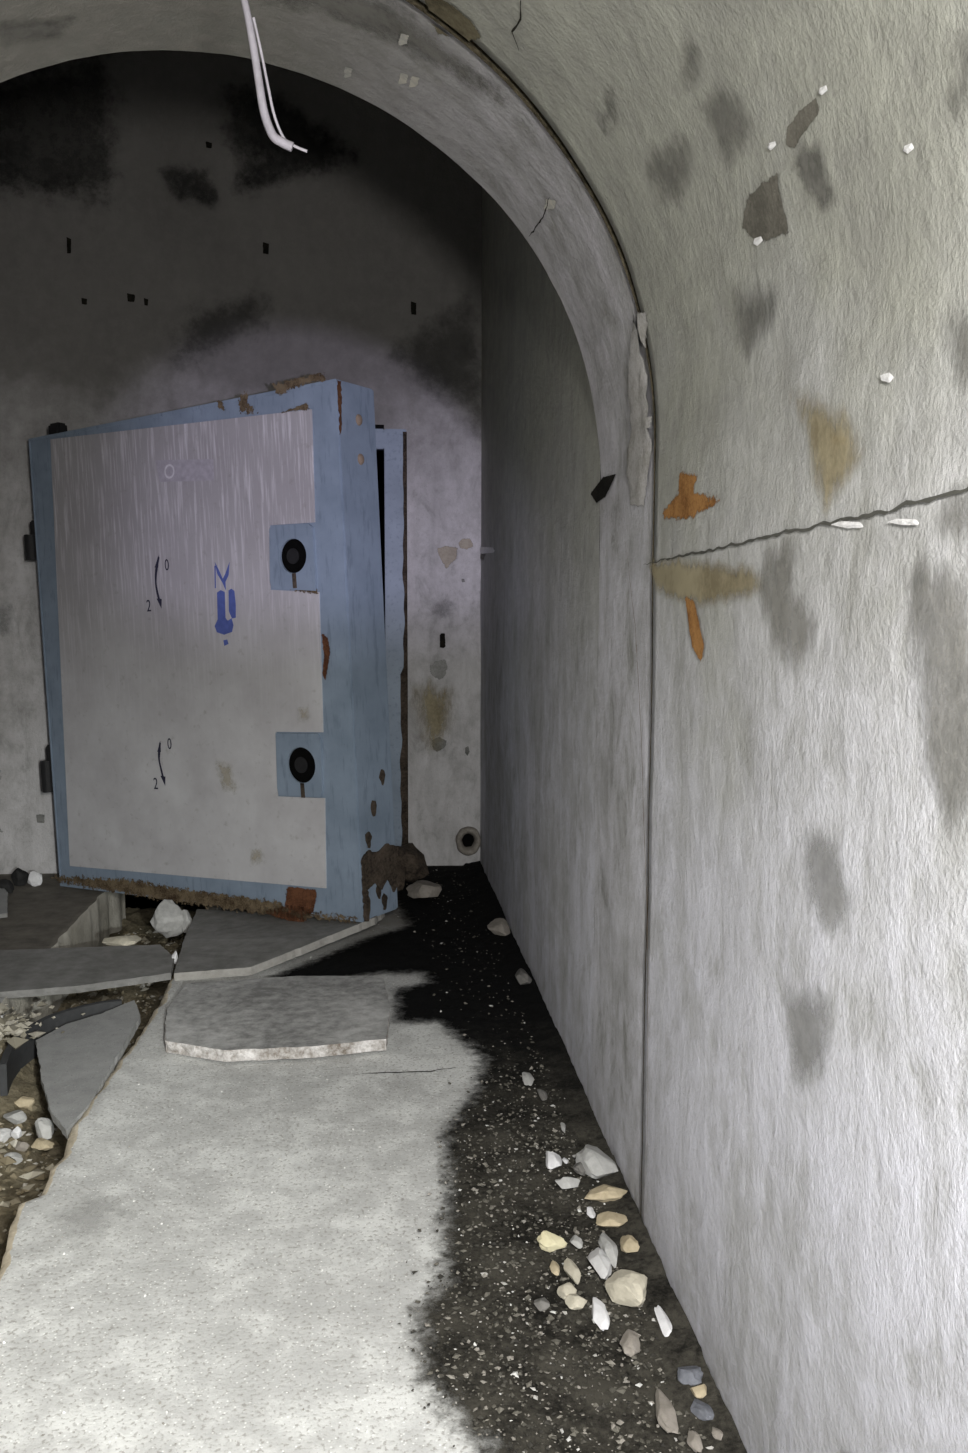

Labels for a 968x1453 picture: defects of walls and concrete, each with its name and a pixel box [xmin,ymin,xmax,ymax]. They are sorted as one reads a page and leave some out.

spalling [424,0,481,42]
rust [217,391,258,415]
rust [272,372,342,434]
crack [627,487,968,1022]